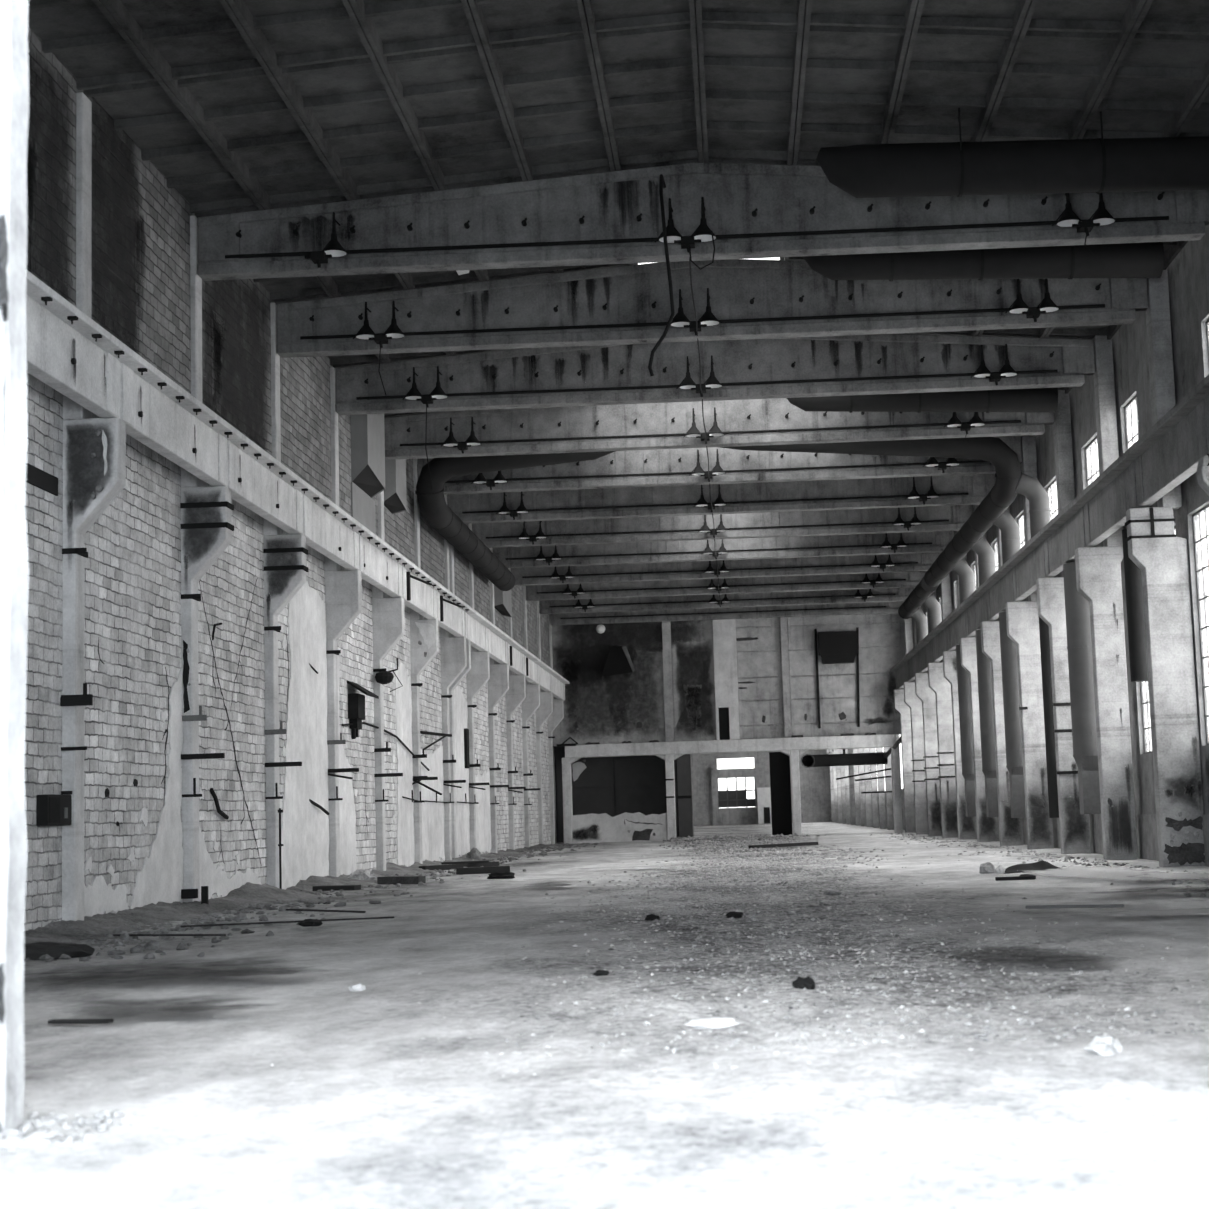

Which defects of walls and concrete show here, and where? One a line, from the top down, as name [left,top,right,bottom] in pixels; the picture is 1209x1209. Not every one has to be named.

water stain [602,180,658,223]
water stain [568,277,610,315]
water stain [811,340,839,362]
water stain [854,341,863,374]
peeling [84,640,191,917]
spalling [1164,812,1205,866]
peeling [199,825,262,900]